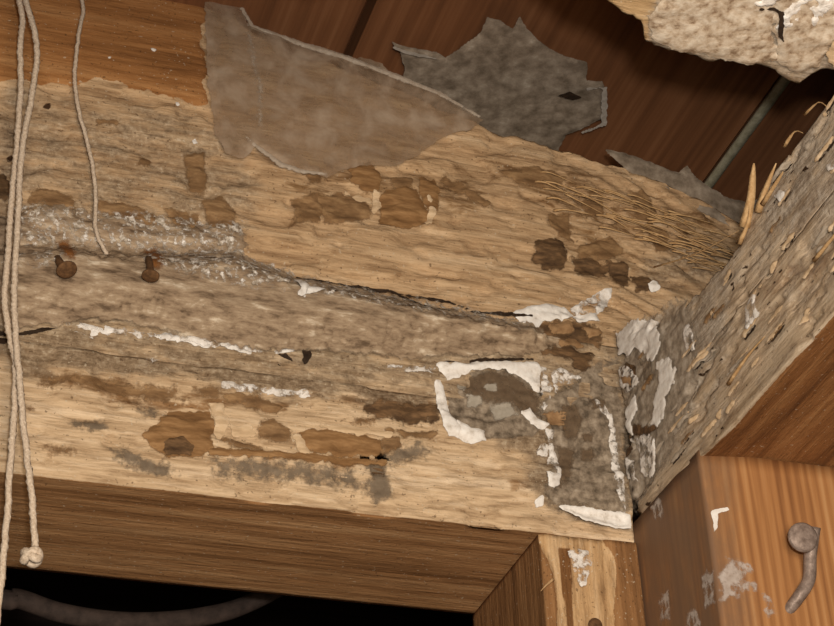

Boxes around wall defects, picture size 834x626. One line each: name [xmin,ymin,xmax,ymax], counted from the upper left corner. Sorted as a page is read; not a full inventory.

peeling [647,0,834,73]
peeling [204,2,491,229]
peeling [804,130,834,162]
peeling [501,166,566,189]
rust [59,241,76,258]
peeling [630,189,669,251]
crack [296,277,533,317]
damp [744,294,759,329]
peeling [142,212,660,487]
crack [445,356,534,364]
damp [356,298,698,512]
peeling [559,318,739,529]